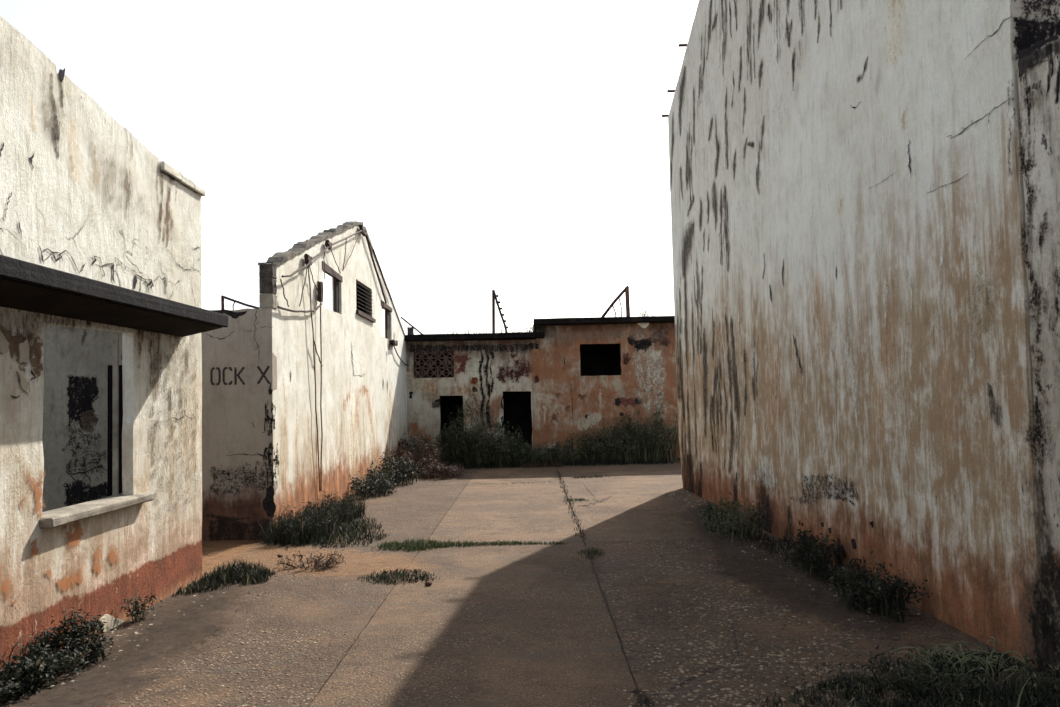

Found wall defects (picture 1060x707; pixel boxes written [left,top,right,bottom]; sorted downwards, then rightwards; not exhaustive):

crack [947,99,1008,138]
crack [871,141,967,193]
crack [0,192,154,292]
peeling [0,313,45,382]
damp [137,330,309,515]
peeling [497,353,539,383]
peeling [543,348,669,431]
damp [613,330,659,367]
damp [661,0,924,645]
damp [1007,0,1060,680]
peeling [45,545,119,591]
crack [559,477,740,707]